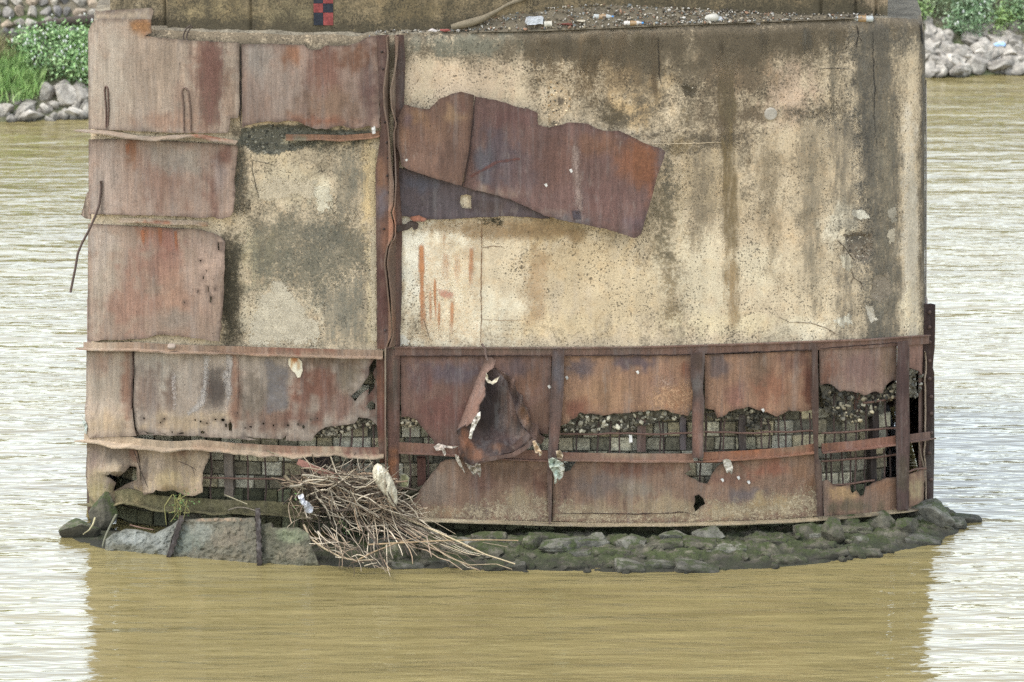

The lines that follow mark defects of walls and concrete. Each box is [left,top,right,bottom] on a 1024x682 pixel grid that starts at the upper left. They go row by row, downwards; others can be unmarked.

damp [519,20,926,338]
damp [221,148,370,345]
corrosion [419,245,453,322]
spalling [316,418,376,438]
spalling [561,407,788,433]
spalling [820,381,896,425]